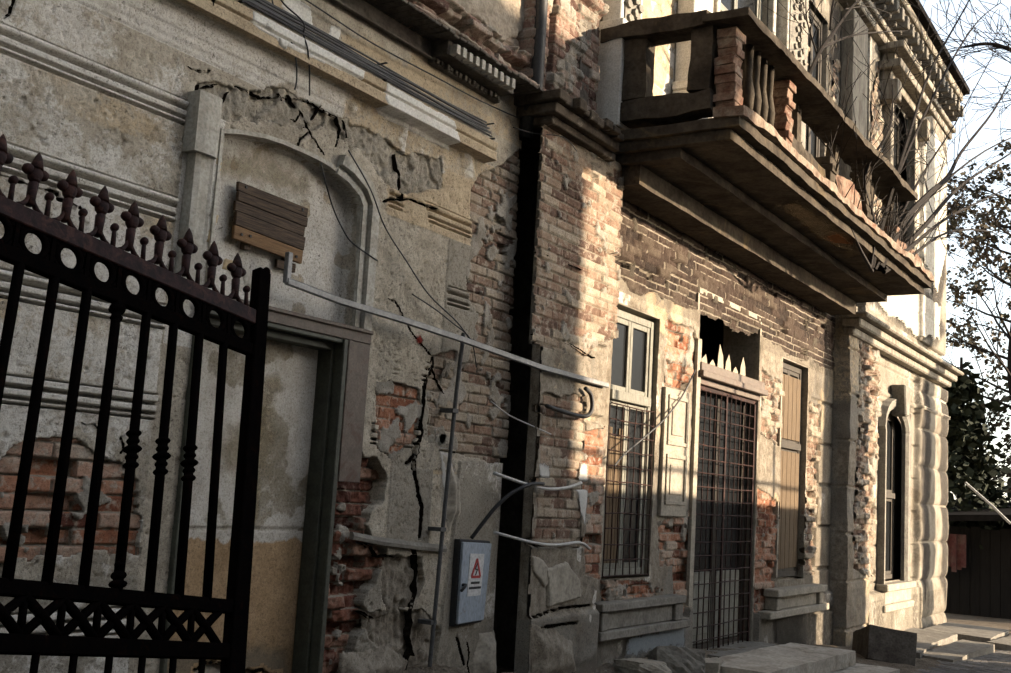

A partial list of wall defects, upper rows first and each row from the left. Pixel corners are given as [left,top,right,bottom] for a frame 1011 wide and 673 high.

crack [5,0,15,17]
crack [188,66,347,155]
peeling [250,11,365,80]
flaking render [199,82,443,194]
flaking render [406,0,609,112]
flaking render [374,150,520,463]
flaking render [0,436,141,564]
water stain [226,435,239,467]
water stain [259,377,280,463]
flaking render [530,392,690,613]
flaking render [851,340,882,578]
flaking render [322,458,437,673]